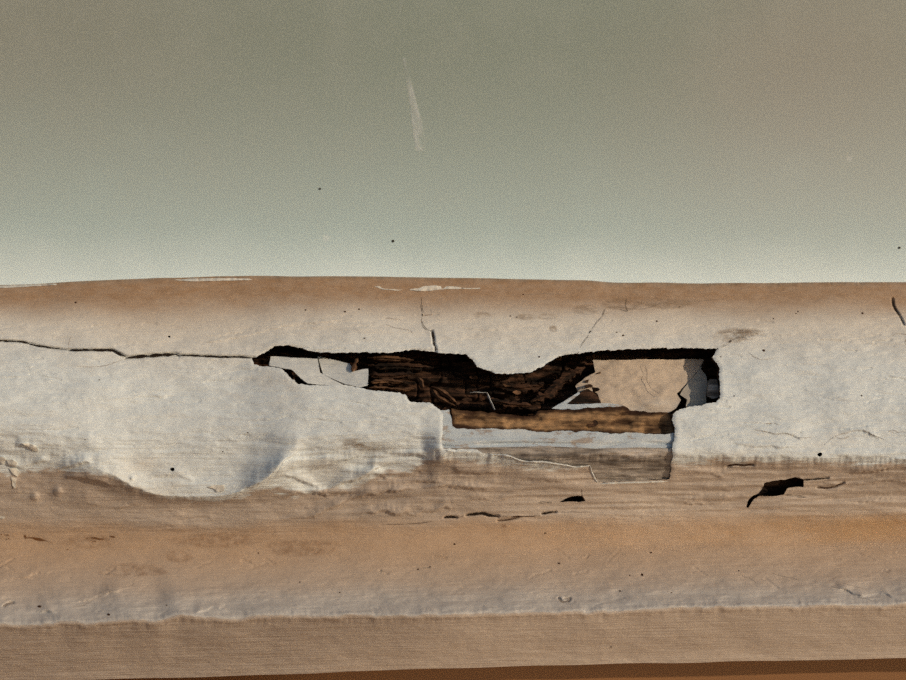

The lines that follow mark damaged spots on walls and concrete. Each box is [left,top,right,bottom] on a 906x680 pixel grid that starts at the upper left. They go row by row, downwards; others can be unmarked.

crack [387,299,436,351]
crack [0,337,251,367]
peeling [269,356,368,388]
peeling [552,359,708,413]
peeling [440,410,674,484]